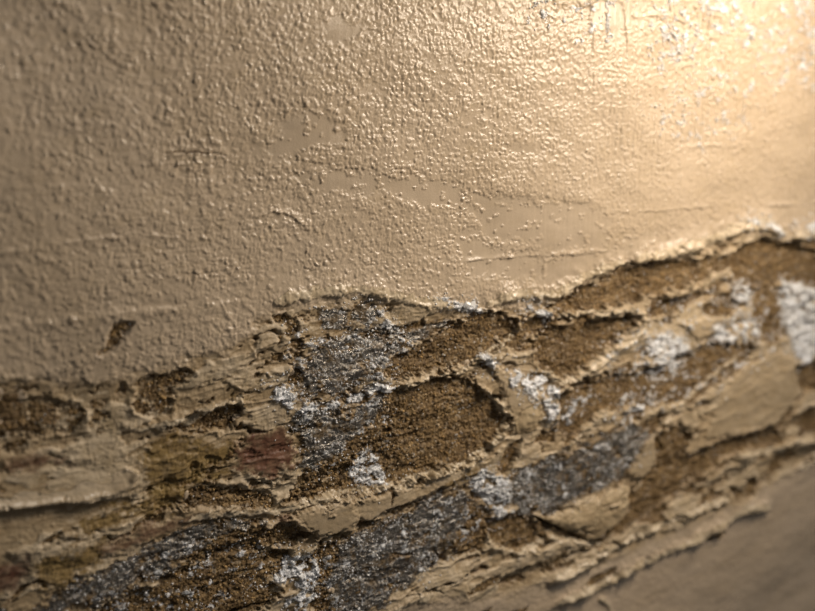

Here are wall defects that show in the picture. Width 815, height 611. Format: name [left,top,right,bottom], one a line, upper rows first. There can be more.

water stain [637,0,815,154]
spalling [0,385,109,453]
peeling [0,469,140,511]
water stain [34,270,815,611]
spalling [90,217,815,611]